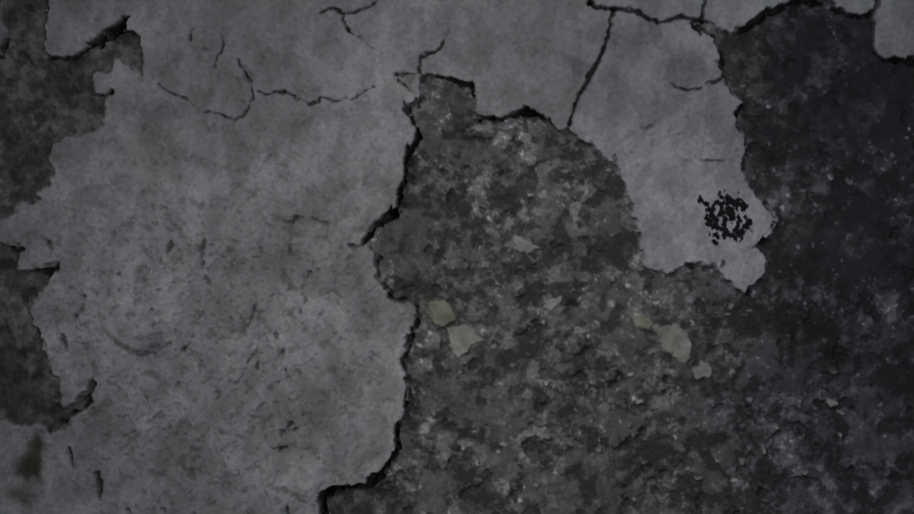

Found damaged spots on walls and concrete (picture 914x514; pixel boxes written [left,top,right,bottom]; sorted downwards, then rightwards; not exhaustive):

flaking render [0,0,144,220]
crack [158,32,450,127]
crack [319,0,379,50]
crack [567,0,707,130]
crack [669,77,724,92]
flaking render [316,0,914,514]
flaking render [0,243,97,432]